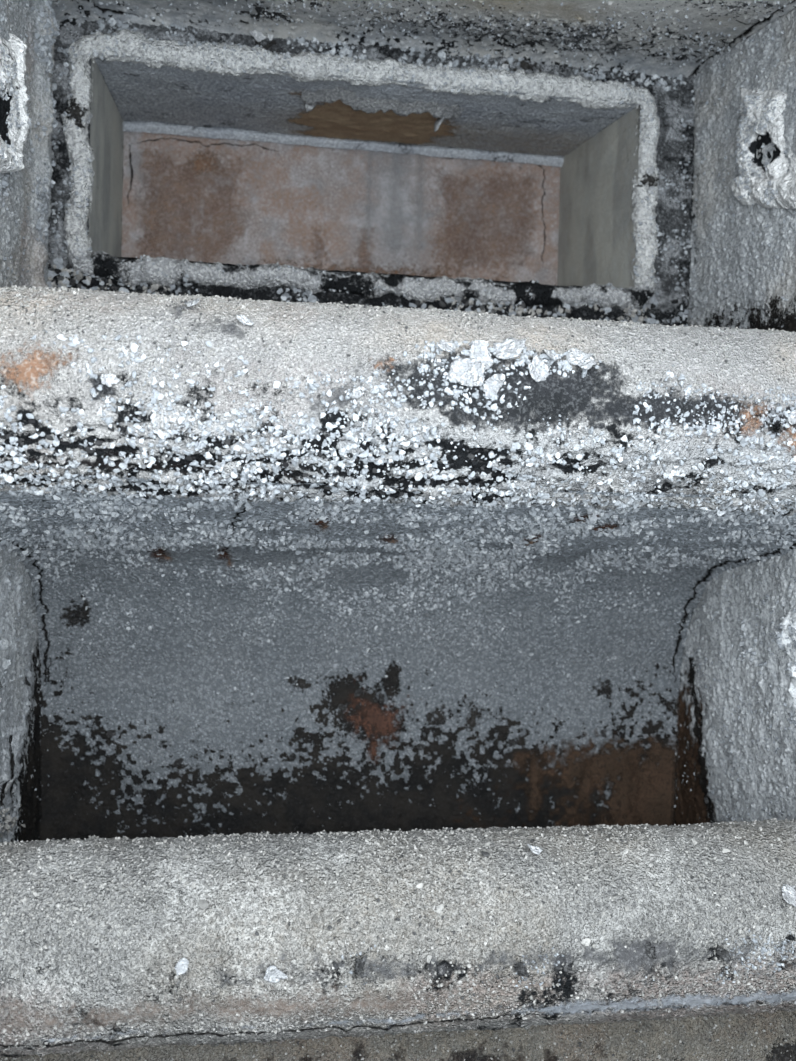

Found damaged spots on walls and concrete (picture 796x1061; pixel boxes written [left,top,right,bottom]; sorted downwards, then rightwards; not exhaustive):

peeling [288,86,464,145]
crack [0,540,52,682]
crack [672,534,796,683]
rust [513,732,676,827]
crack [0,999,783,1049]